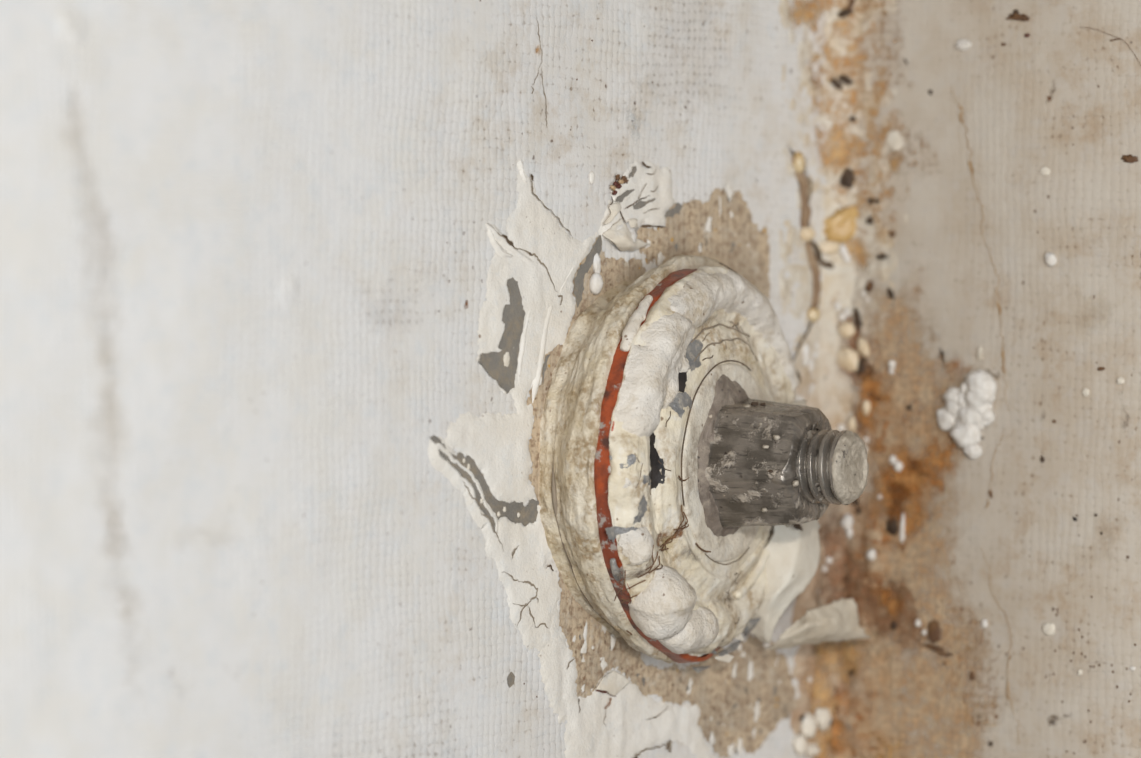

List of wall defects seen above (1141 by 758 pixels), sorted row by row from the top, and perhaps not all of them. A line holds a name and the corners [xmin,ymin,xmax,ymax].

rust [790,0,924,238]
peeling [840,167,856,189]
peeling [839,244,851,264]
rust [846,229,867,266]
peeling [428,182,771,542]
peeling [853,307,862,332]
peeling [856,356,866,375]
rust [818,317,956,651]
peeling [554,560,805,758]
rust [805,641,859,758]